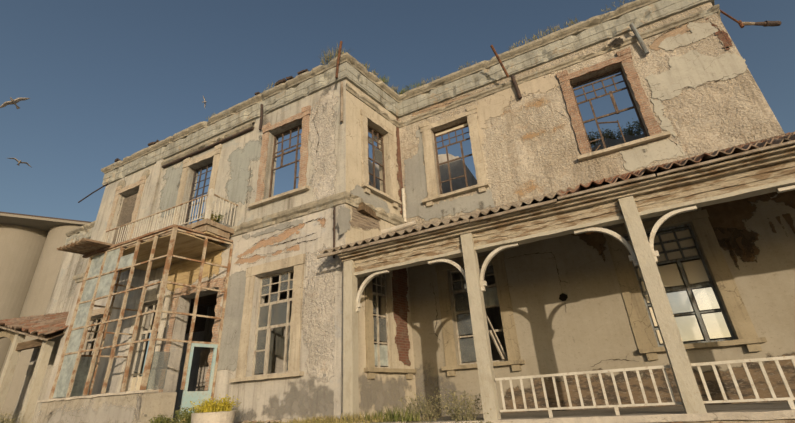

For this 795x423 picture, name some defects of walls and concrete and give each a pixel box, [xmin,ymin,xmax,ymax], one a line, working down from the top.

flaking render [706,18,733,50]
flaking render [234,223,305,266]
flaking render [391,268,411,366]